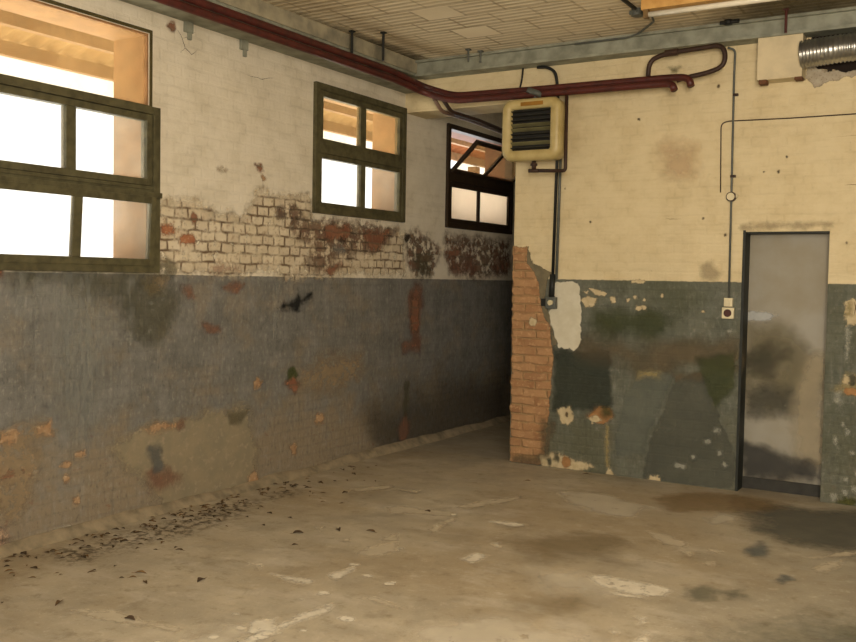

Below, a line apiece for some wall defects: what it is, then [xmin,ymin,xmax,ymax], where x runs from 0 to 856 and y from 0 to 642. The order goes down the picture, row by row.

flaking render [806,61,856,88]
peeling [160,163,593,471]
water stain [596,312,664,335]
water stain [748,311,773,321]
flaking render [844,298,856,325]
water stain [553,330,811,414]
flaking render [836,375,856,396]
flaking render [588,406,613,424]